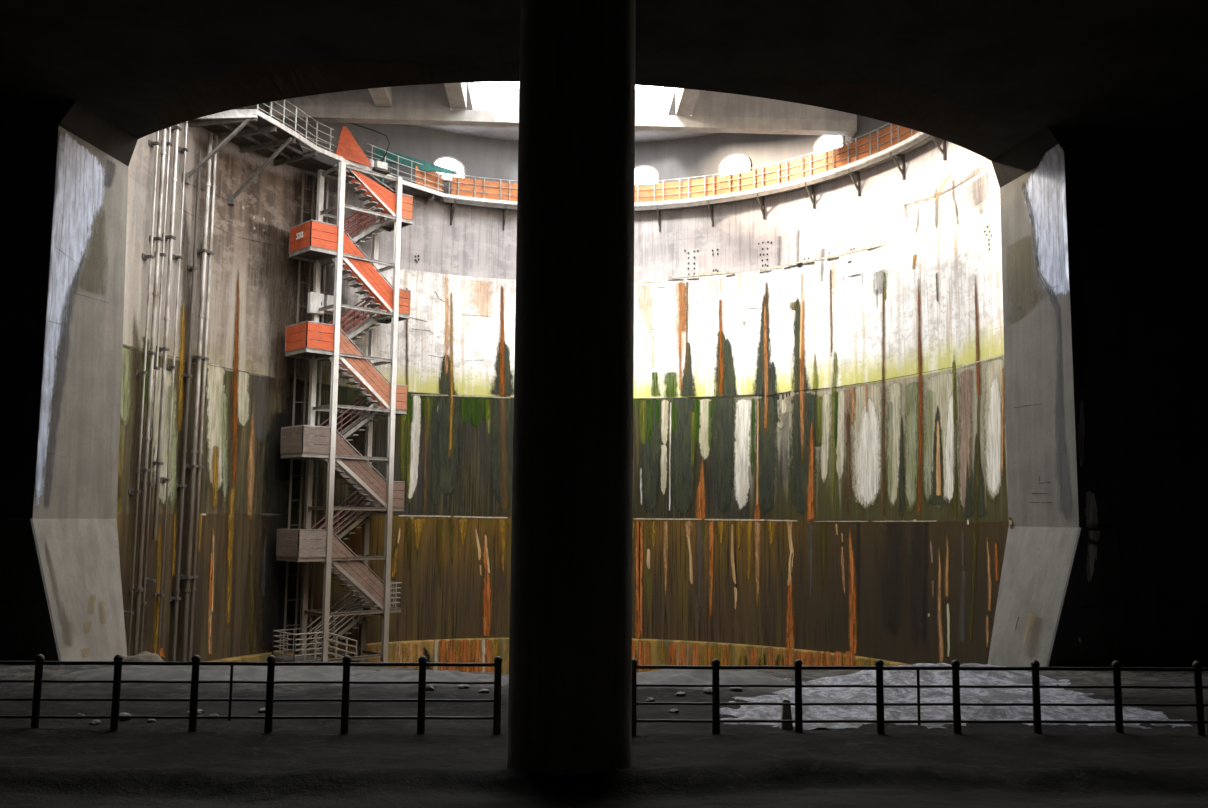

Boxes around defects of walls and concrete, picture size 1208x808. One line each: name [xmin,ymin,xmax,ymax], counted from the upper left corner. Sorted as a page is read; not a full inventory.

rust [199,274,254,659]
rust [368,281,508,673]
damp [401,342,514,505]
rust [632,274,875,673]
damp [640,296,1004,517]